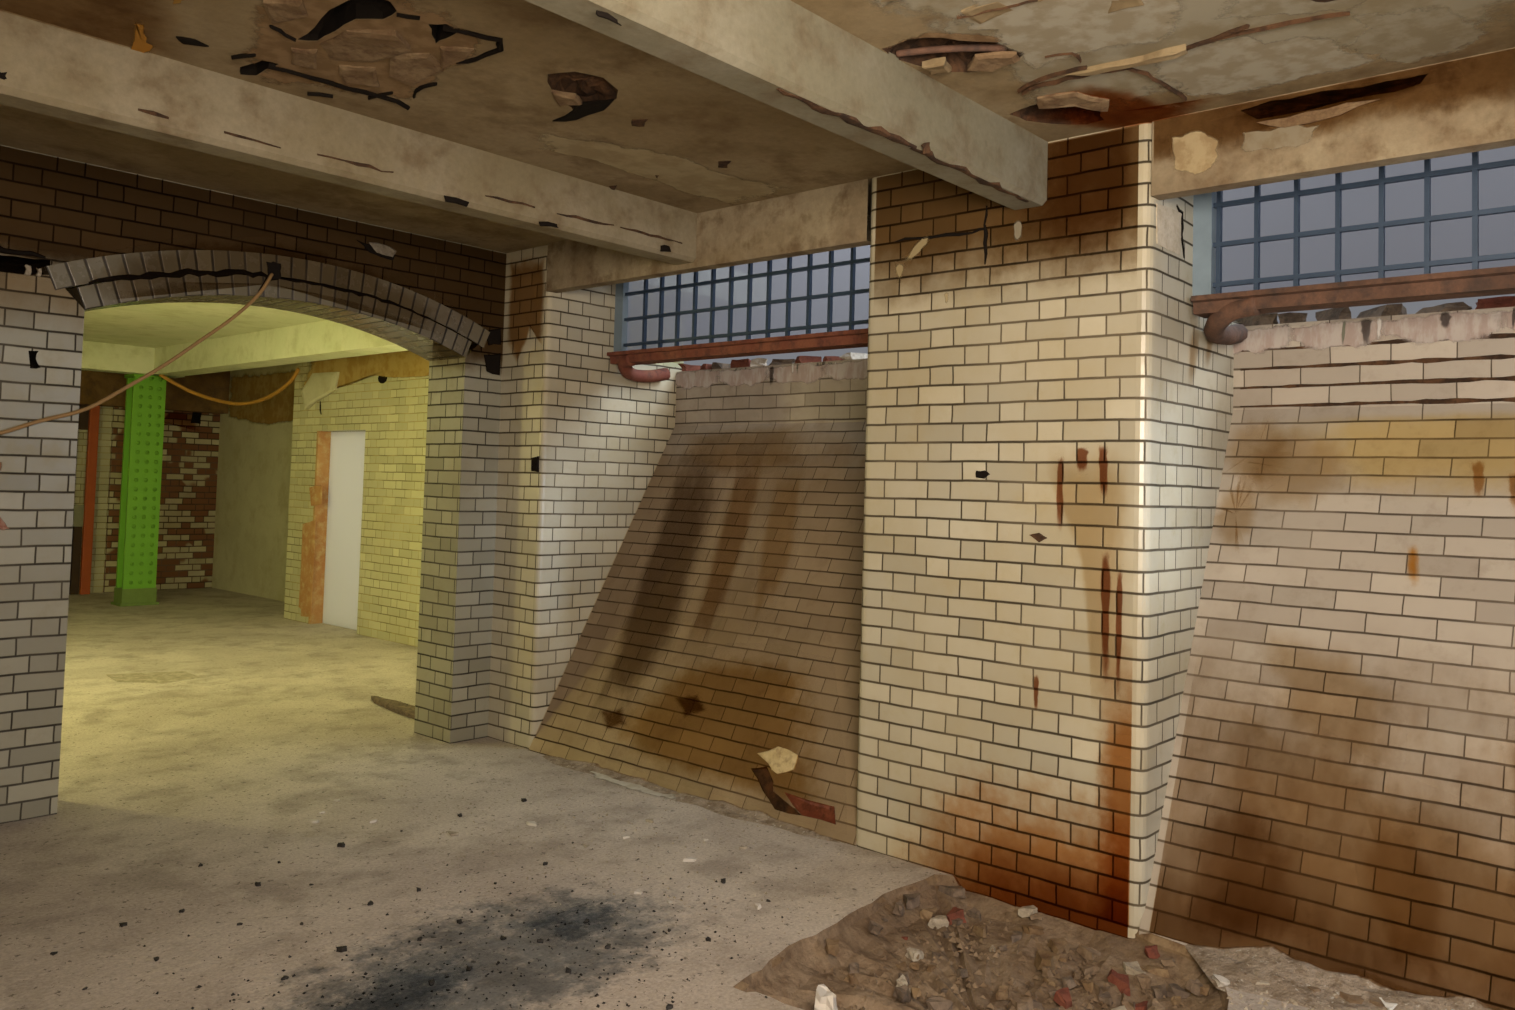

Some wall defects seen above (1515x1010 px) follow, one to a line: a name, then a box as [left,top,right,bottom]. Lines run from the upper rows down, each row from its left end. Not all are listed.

spalling [231,0,504,110]
peeling [876,0,1515,175]
peeling [541,72,782,203]
spalling [1235,296,1515,326]
corrosion [1057,449,1107,521]
corrosion [1101,559,1122,671]
spalling [603,710,621,727]
spalling [679,698,702,714]
spalling [751,747,836,824]